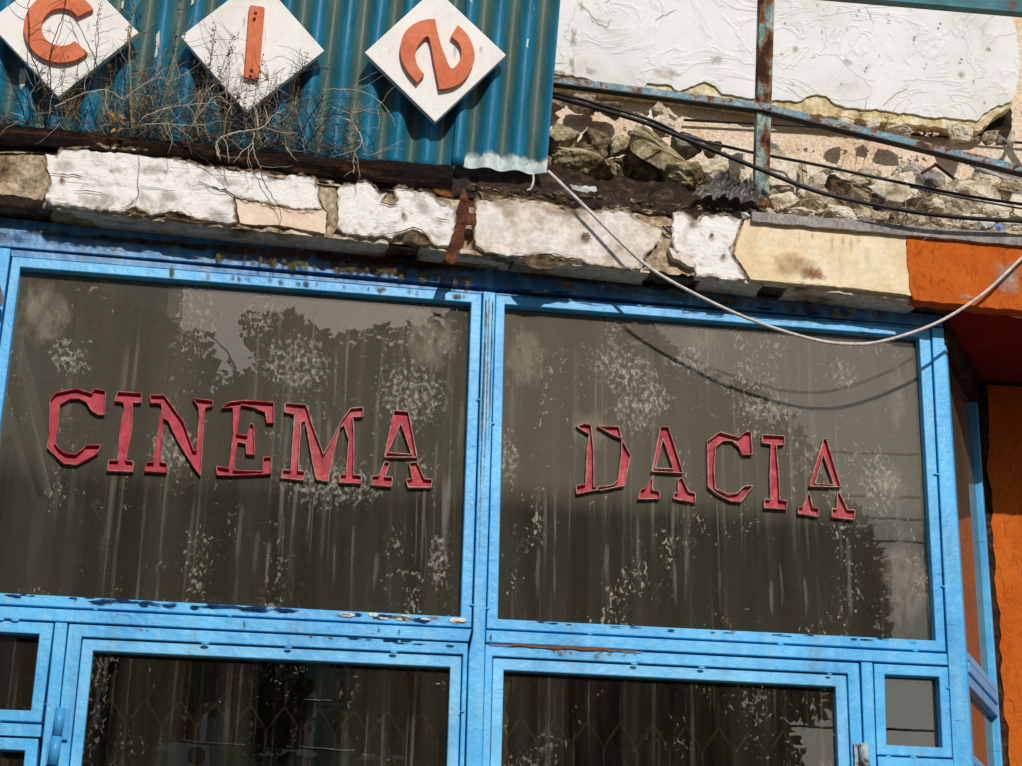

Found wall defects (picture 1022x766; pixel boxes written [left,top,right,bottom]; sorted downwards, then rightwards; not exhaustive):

spalling [977,108,1012,140]
rust [31,188,477,298]
peeling [0,143,914,319]
rust [521,272,856,315]